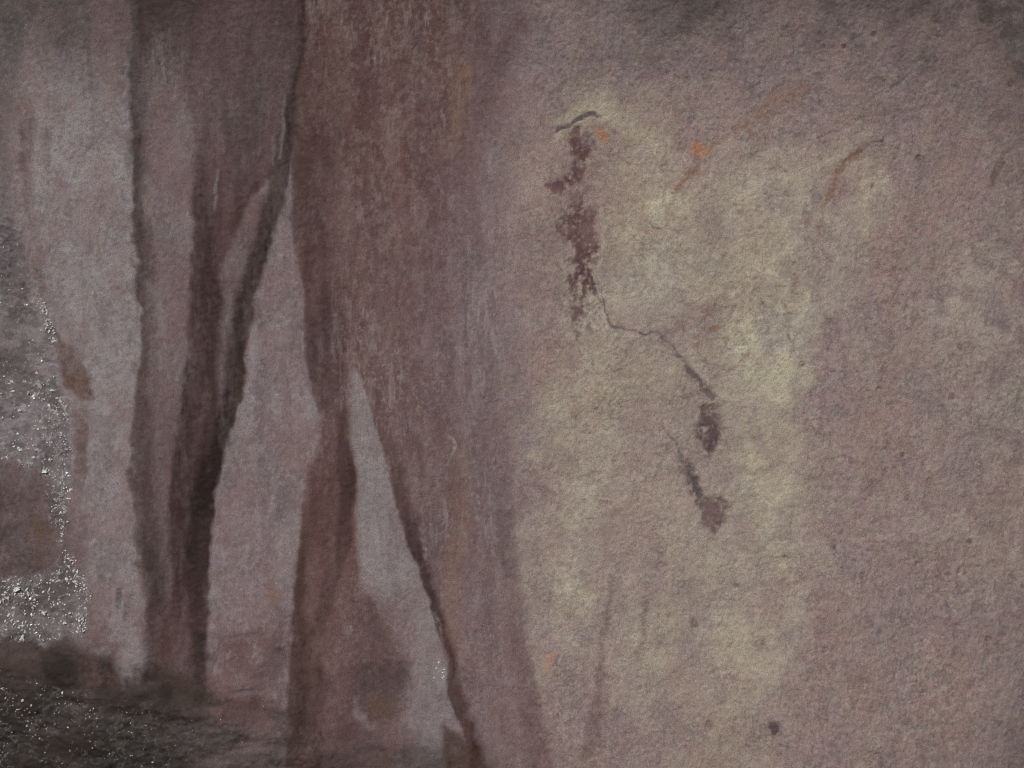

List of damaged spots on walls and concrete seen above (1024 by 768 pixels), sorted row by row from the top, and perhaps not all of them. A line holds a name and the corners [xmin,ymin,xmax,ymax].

water stain [0,0,558,768]
crack [590,286,723,401]
water stain [519,72,1024,768]